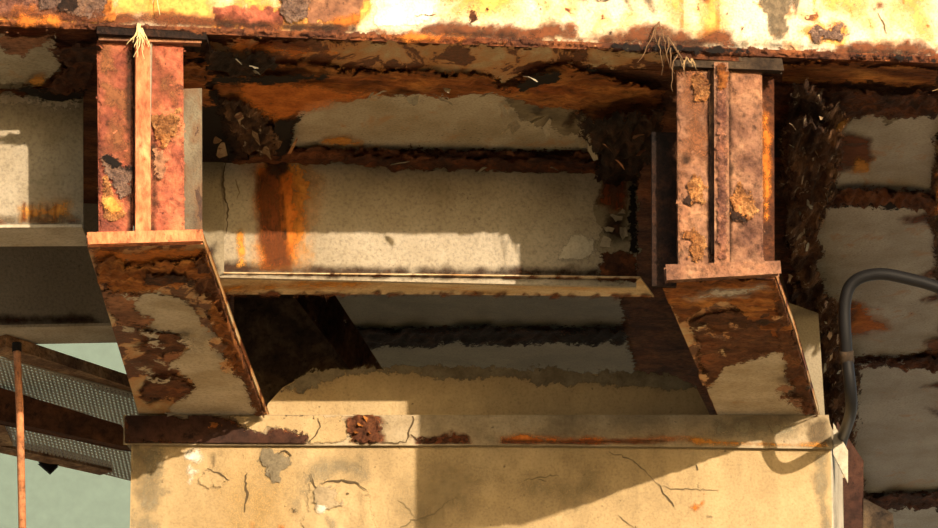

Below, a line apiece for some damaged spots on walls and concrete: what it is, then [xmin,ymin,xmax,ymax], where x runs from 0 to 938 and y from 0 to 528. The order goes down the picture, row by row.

peeling [304,0,371,27]
corrosion [0,0,938,63]
corrosion [96,40,135,232]
corrosion [151,44,186,231]
peeling [480,92,598,161]
corrosion [676,69,714,264]
corrosion [94,162,601,412]
spalling [102,289,354,484]
peeling [686,307,797,385]
peeling [823,321,841,385]
crack [399,495,457,528]
crack [610,452,711,506]